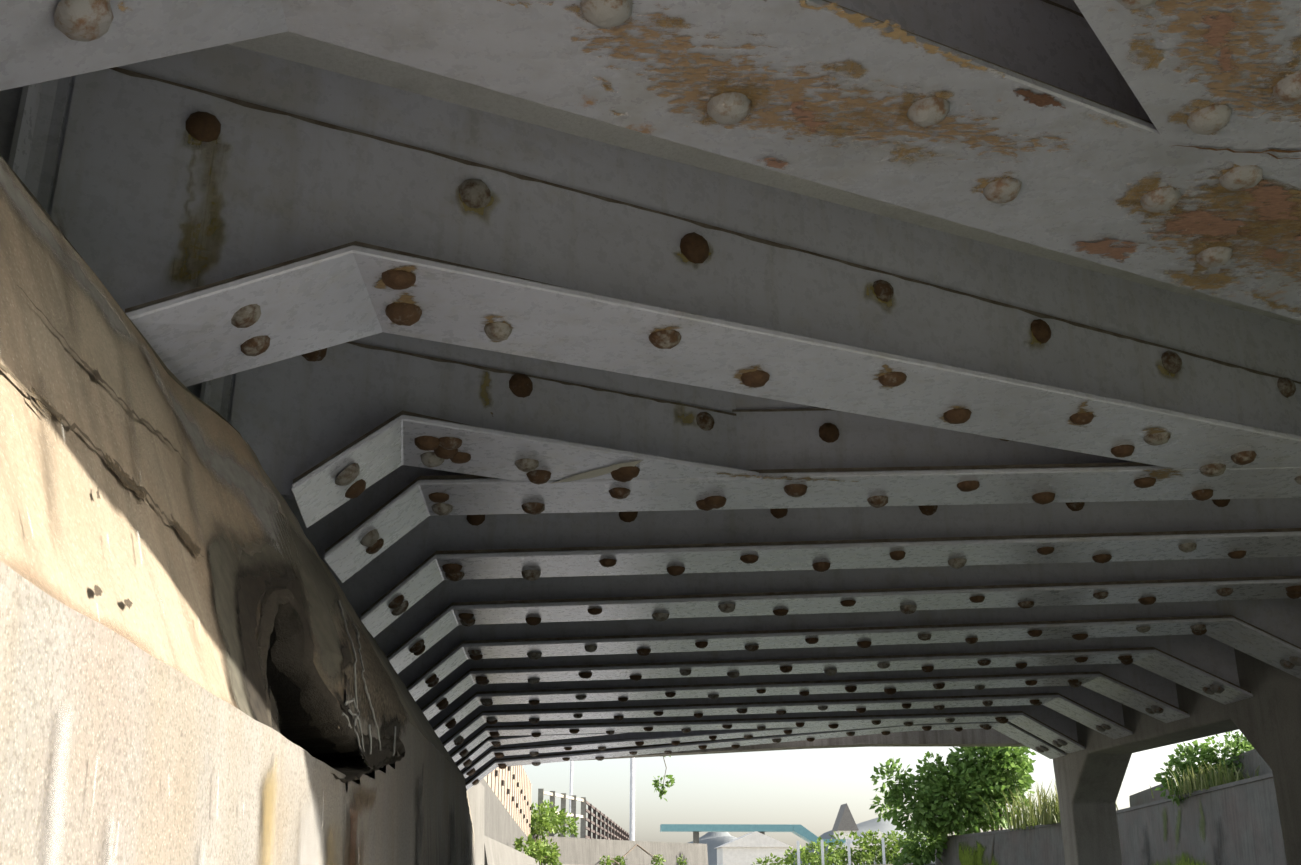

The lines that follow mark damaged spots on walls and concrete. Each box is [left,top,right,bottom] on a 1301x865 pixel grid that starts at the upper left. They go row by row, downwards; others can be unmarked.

rust [547,0,1086,193]
rust [1129,0,1301,127]
rust [1115,164,1301,313]
crack [0,364,204,557]
crack [17,285,191,469]
spalling [258,586,409,783]